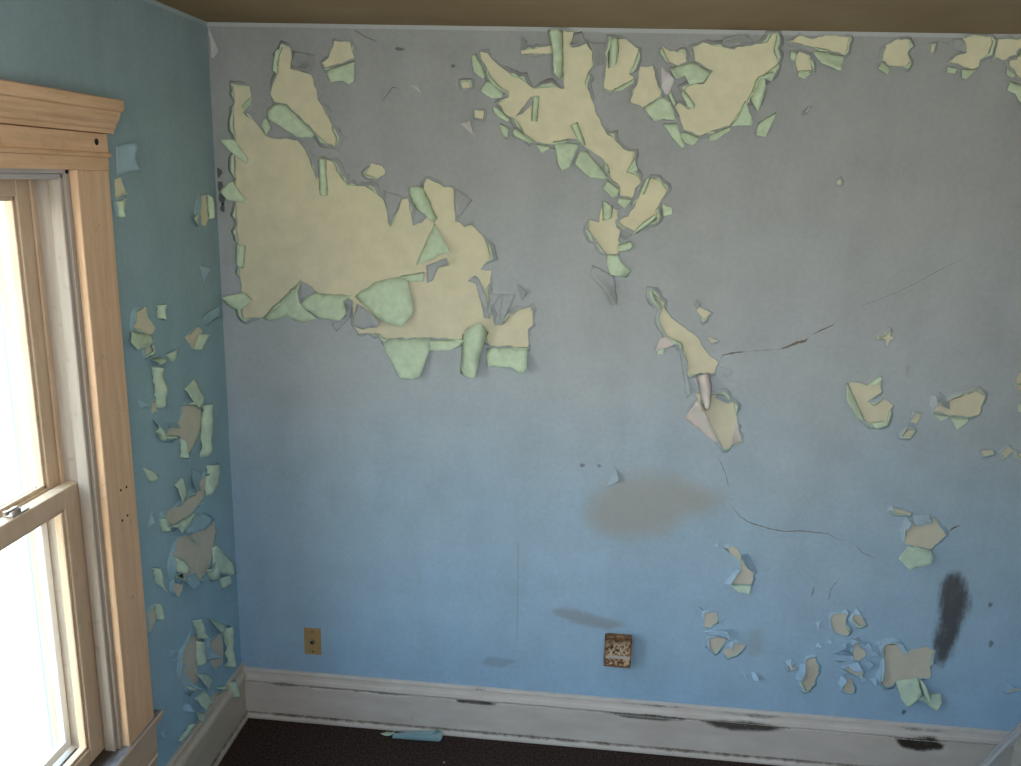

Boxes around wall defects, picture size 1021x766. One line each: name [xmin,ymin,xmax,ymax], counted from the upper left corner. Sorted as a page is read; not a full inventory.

peeling [928,34,1021,102]
peeling [458,28,854,305]
peeling [130,38,537,598]
peeling [646,286,744,453]
crack [720,322,835,359]
peeling [846,375,988,440]
damp [562,454,748,557]
crack [719,460,874,558]
peeling [884,504,949,570]
peeling [160,618,240,742]
peeling [784,607,943,712]
damp [925,566,994,674]